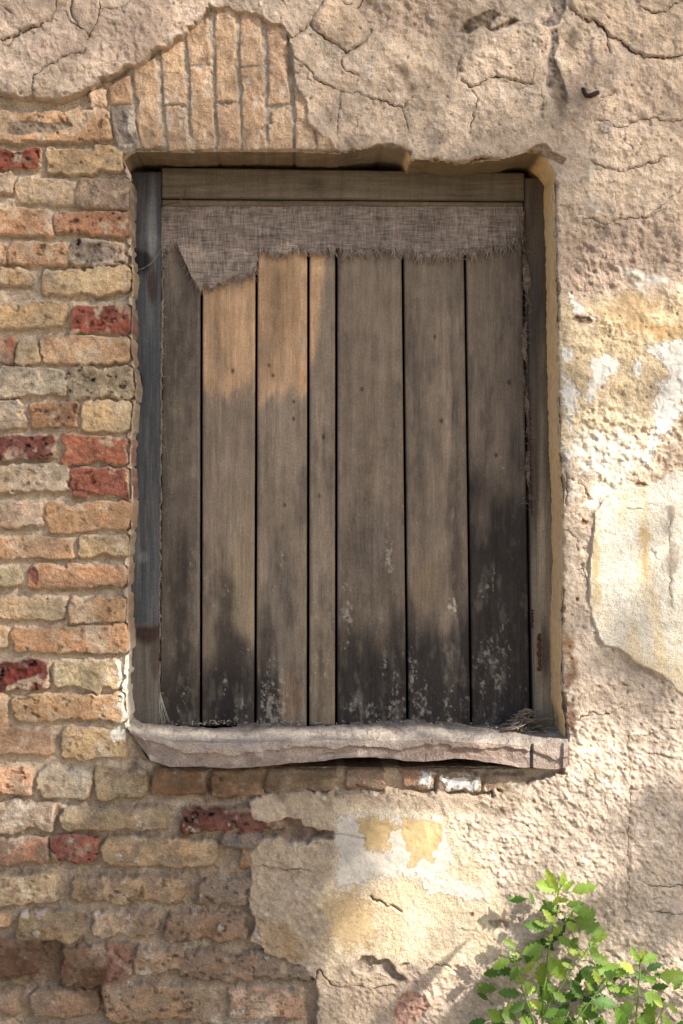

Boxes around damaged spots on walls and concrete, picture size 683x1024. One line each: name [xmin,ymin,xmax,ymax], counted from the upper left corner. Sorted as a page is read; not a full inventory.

crack [1,0,110,93]
crack [288,0,412,130]
spalling [459,9,522,35]
crack [571,8,683,60]
crack [457,63,524,124]
crack [599,92,683,128]
crack [592,157,662,172]
crack [584,188,681,225]
peeling [567,291,594,323]
peeling [557,339,683,516]
peeling [267,806,492,1024]
spalling [487,920,512,930]